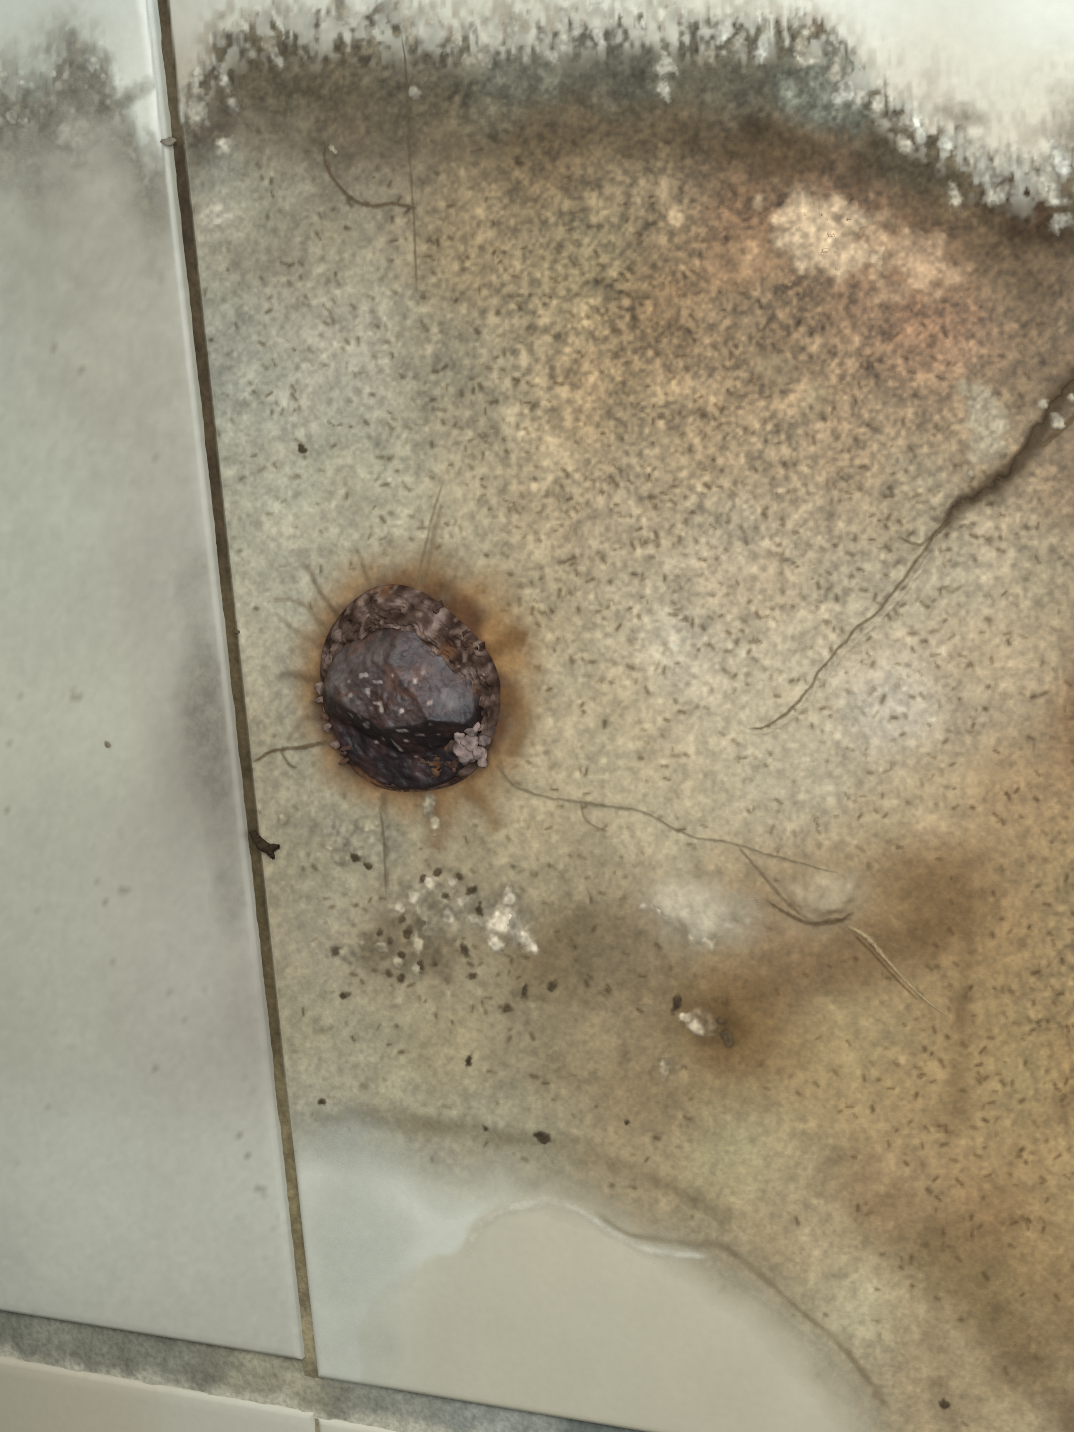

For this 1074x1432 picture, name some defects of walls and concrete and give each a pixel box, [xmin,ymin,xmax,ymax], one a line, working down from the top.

leakage [0,51,122,141]
leakage [197,5,1074,270]
crack [753,374,1074,734]
corrosion [304,566,523,809]
leakage [183,82,1074,1432]